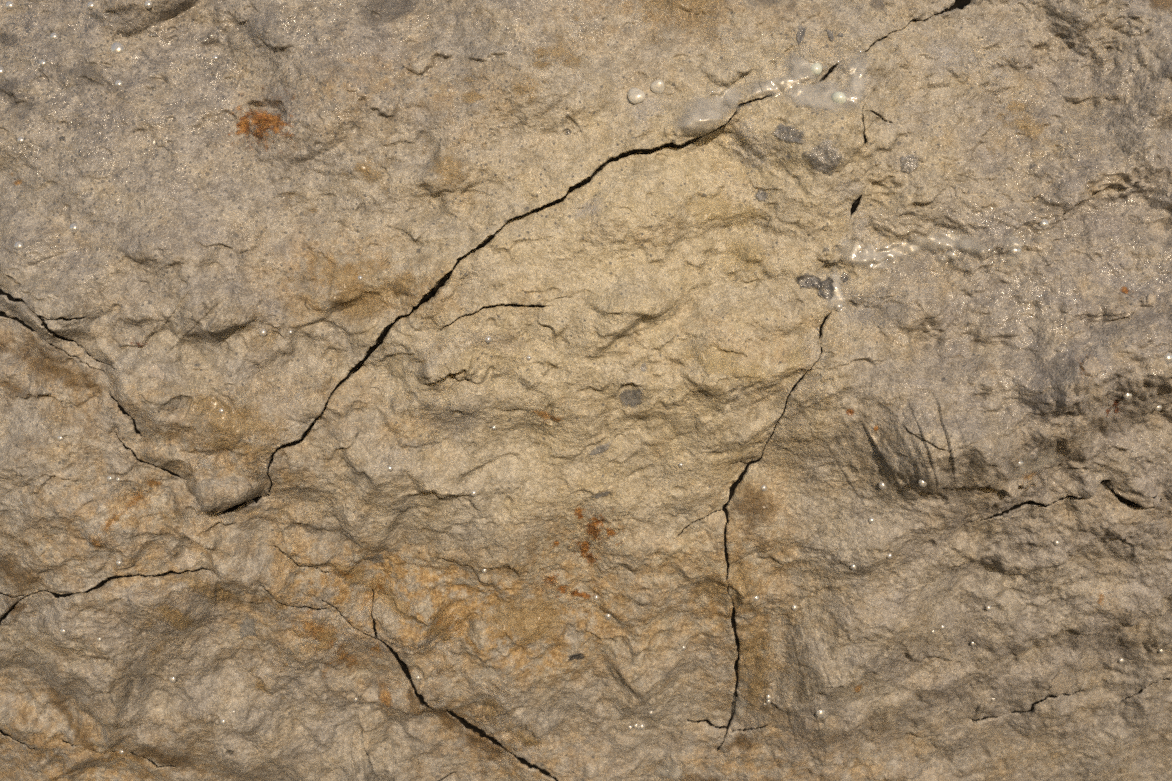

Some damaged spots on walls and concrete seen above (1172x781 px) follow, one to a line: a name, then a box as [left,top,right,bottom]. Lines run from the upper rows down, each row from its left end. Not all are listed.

crack [818,0,971,83]
corrosion [236,108,286,141]
leakage [679,56,867,133]
crack [862,106,893,147]
crack [850,195,862,217]
crack [222,92,780,514]
crack [0,290,182,478]
crack [678,315,829,752]
crack [0,568,215,624]
crack [260,546,558,781]
crack [0,729,32,750]
crack [60,739,176,768]